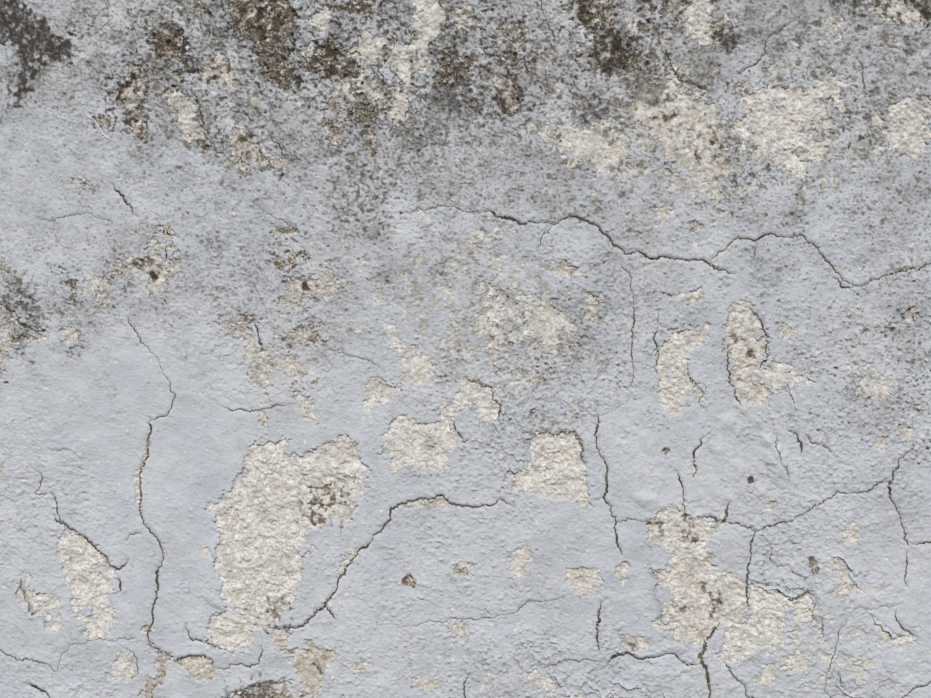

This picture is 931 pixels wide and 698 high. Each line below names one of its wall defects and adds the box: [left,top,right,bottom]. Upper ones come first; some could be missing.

mould [0,0,76,109]
mould [429,0,685,125]
mould [717,29,741,51]
crack [399,205,931,554]
peeling [15,529,117,641]
crack [1,318,289,698]
peeling [107,410,369,698]
crack [273,494,511,630]
peeling [502,430,594,511]
crack [542,598,754,698]
peeling [618,506,865,665]
crack [678,437,931,698]